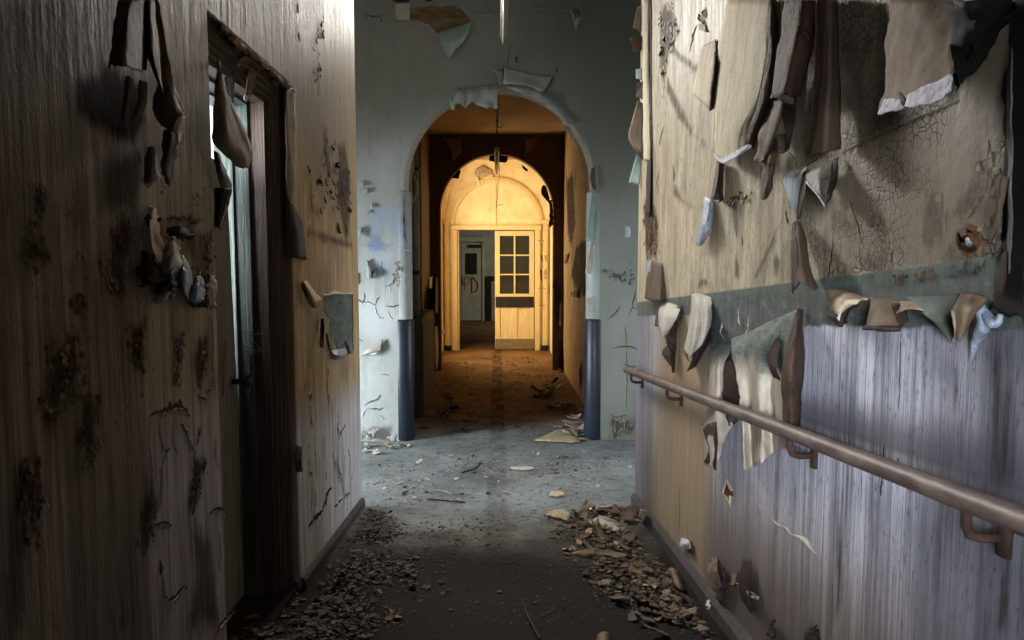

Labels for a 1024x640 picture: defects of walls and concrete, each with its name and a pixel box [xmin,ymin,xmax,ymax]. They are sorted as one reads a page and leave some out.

peeling [108,0,185,188]
peeling [137,17,352,309]
crack [359,247,411,319]
peeling [393,0,473,58]
peeling [449,66,577,148]
peeling [563,0,805,472]
peeling [692,0,1024,411]
crack [789,100,960,174]
crack [608,289,637,434]
crack [148,306,226,571]
crack [160,559,188,612]
damp [191,526,218,626]